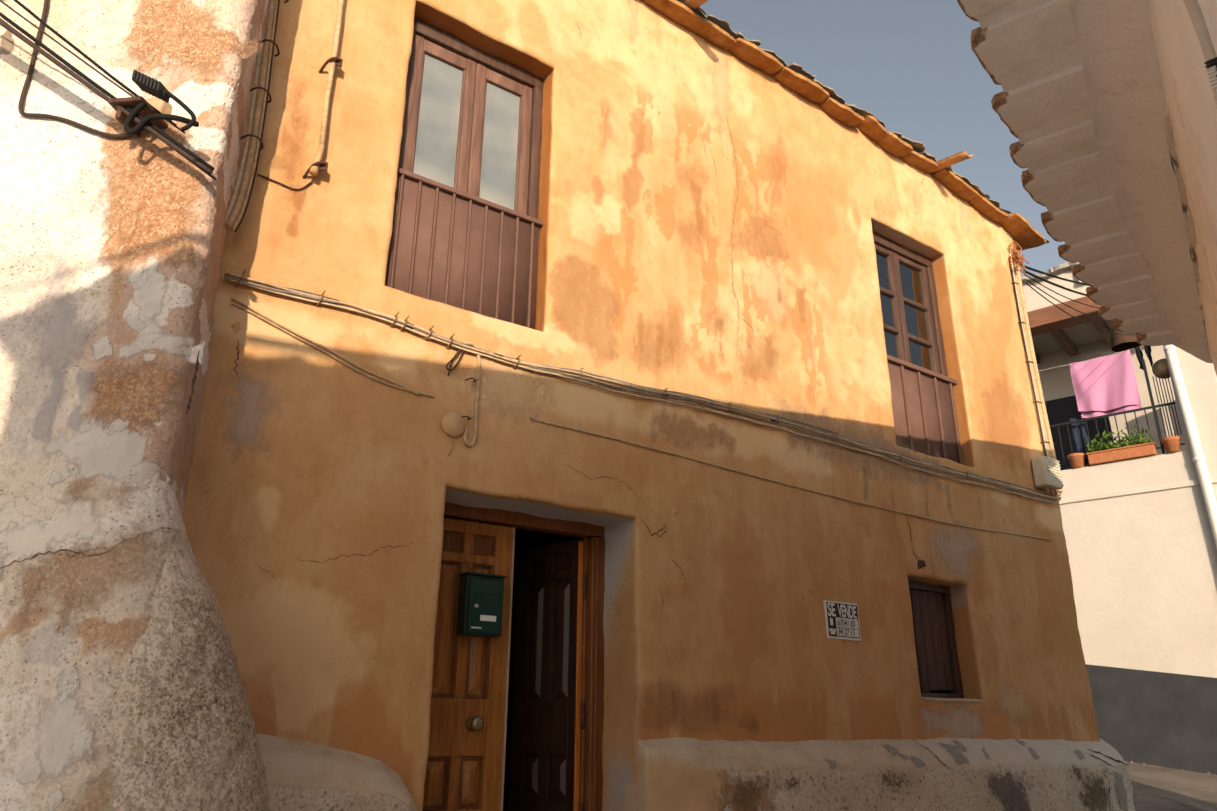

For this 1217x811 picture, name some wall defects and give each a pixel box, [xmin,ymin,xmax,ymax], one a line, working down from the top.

peeling [91,255,205,363]
water stain [751,266,787,322]
crack [0,528,173,569]
crack [258,544,416,578]
crack [559,463,686,613]
water stain [987,768,1031,811]
water stain [1073,765,1108,811]
crack [1088,749,1129,811]